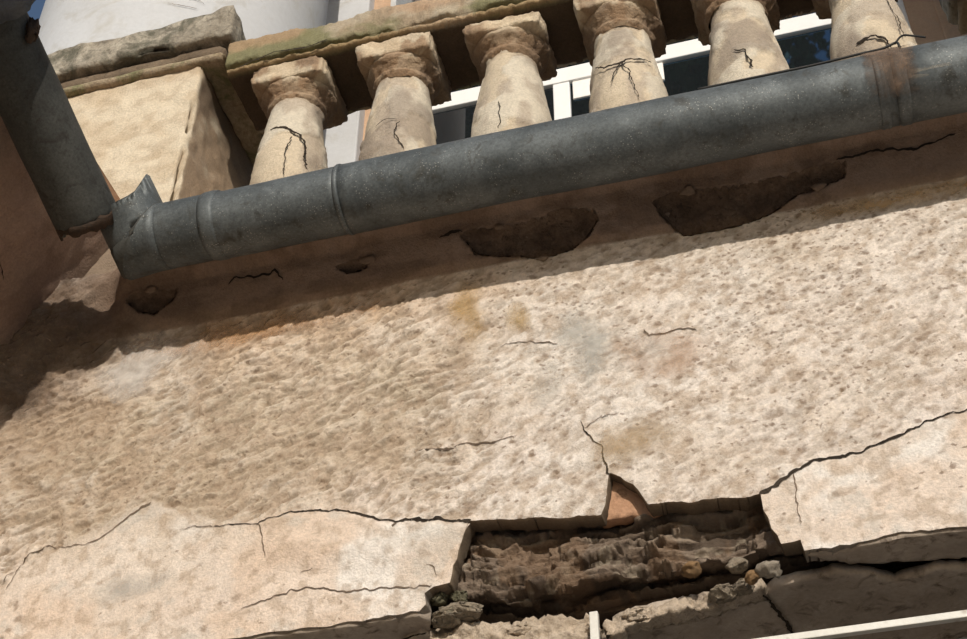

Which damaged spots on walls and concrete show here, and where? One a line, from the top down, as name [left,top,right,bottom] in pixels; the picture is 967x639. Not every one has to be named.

crack [595,58,652,97]
crack [270,126,308,174]
spalling [653,160,846,236]
spalling [459,208,598,261]
spalling [125,286,177,314]
crack [421,436,512,450]
crack [581,412,619,474]
crack [759,409,967,524]
crack [3,502,151,587]
crack [186,508,471,555]
crack [241,564,437,609]
spalling [429,481,824,639]